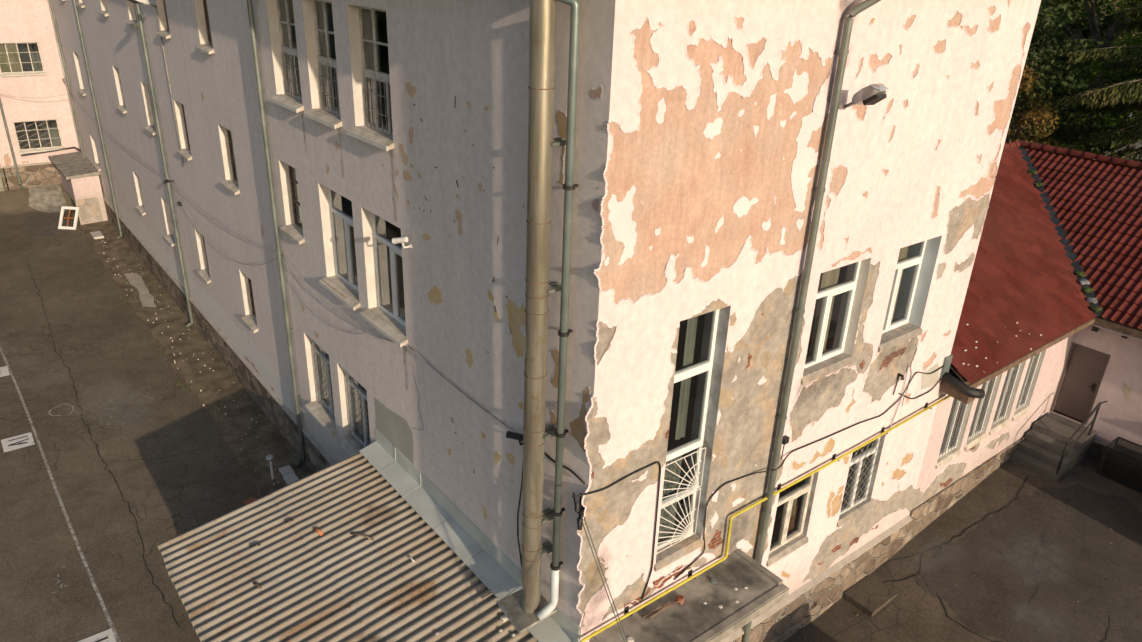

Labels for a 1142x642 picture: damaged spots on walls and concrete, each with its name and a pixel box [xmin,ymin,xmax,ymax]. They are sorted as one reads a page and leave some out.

peeling [854,44,902,79]
peeling [903,13,916,31]
peeling [932,0,1010,54]
peeling [381,80,431,213]
peeling [555,109,567,187]
peeling [589,15,848,305]
peeling [851,100,867,121]
peeling [883,97,909,143]
flaking render [930,21,1031,280]
peeling [487,277,527,370]
flaking render [549,236,937,628]